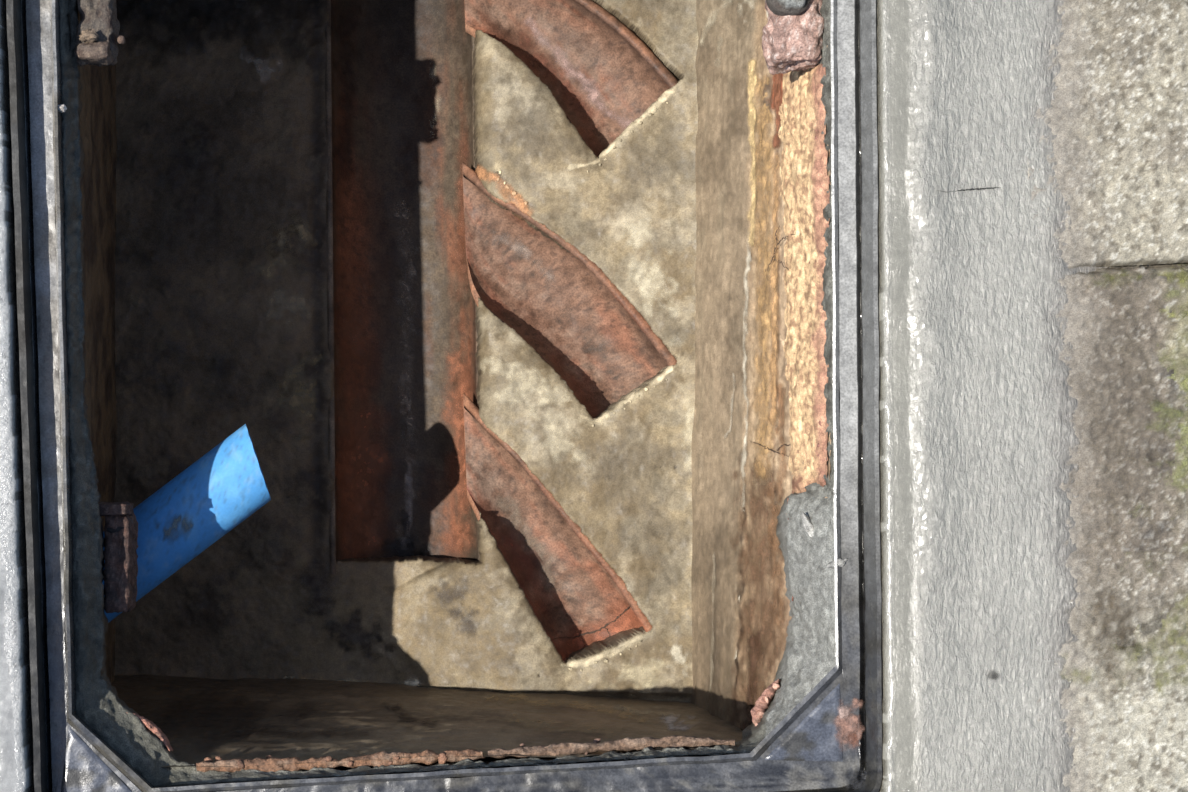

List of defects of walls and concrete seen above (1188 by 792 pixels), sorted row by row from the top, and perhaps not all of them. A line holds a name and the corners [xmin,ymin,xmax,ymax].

rust [771,73,783,148]
rust [446,354,469,508]
rust [566,618,632,654]
spalling [751,679,781,726]
rust [836,699,862,745]